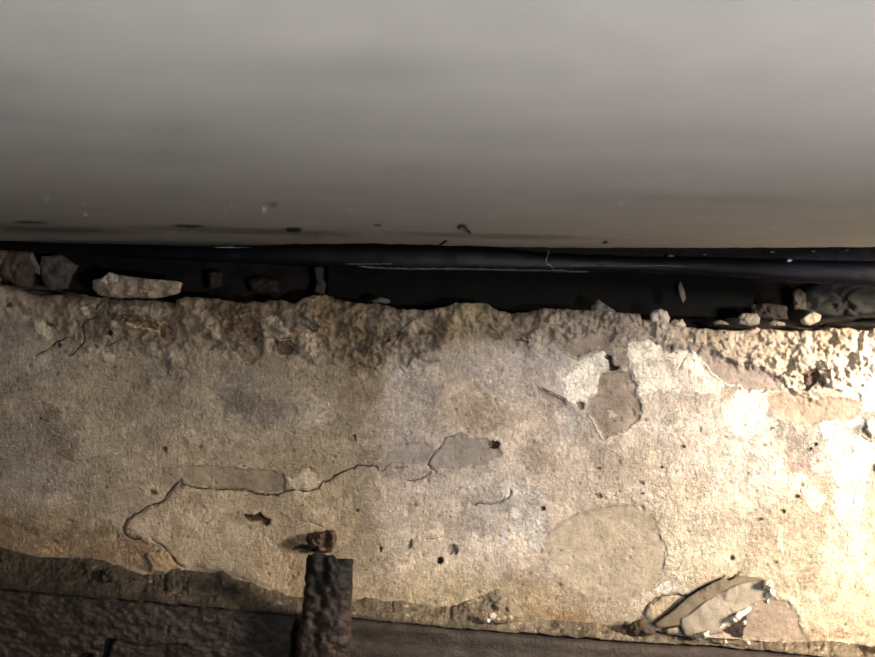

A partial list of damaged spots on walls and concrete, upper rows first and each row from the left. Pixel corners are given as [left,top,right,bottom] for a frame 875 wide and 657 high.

crack [36,297,168,356]
spalling [536,370,644,441]
spalling [685,336,868,426]
spalling [180,463,286,494]
crack [123,436,453,568]
spalling [429,432,503,470]
rust [282,539,302,558]